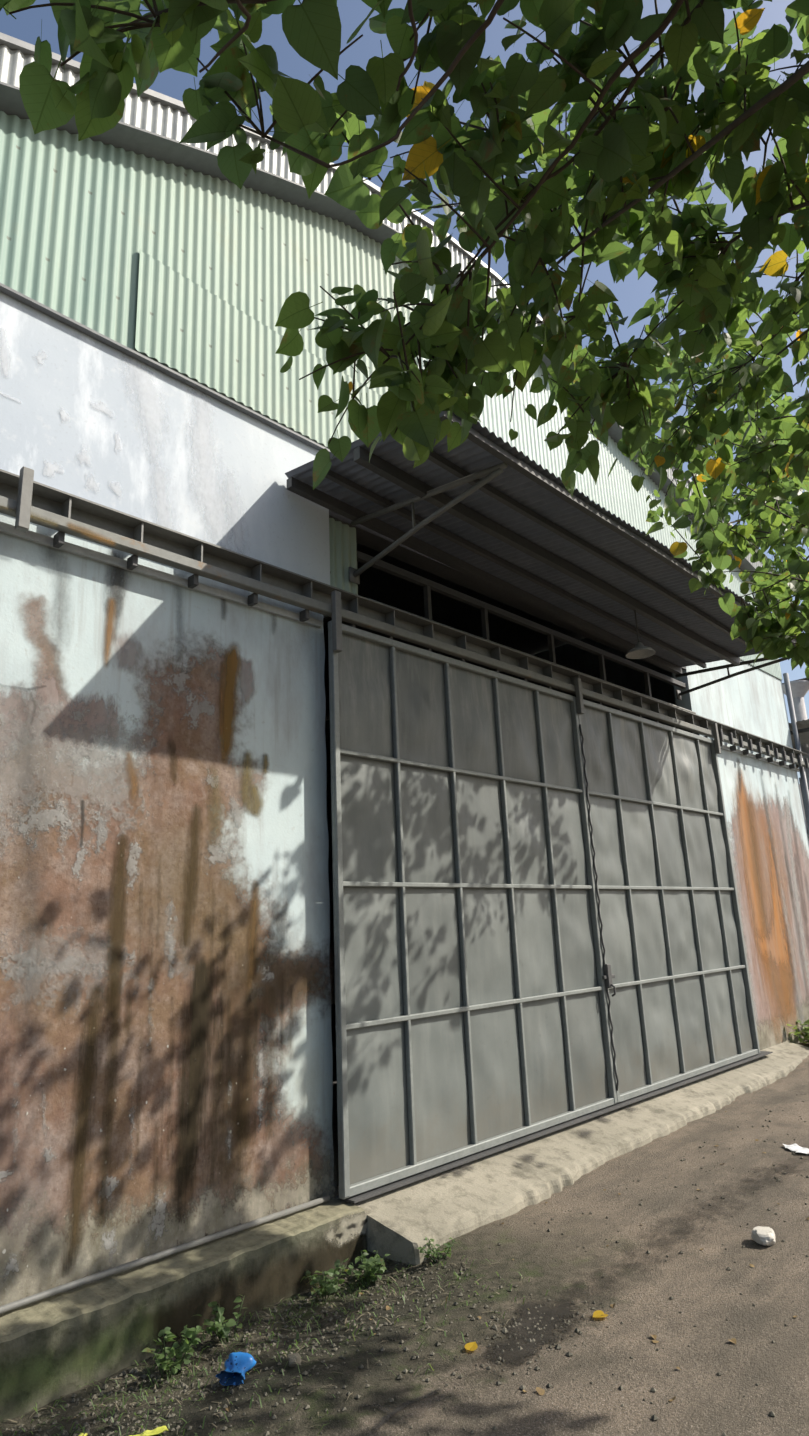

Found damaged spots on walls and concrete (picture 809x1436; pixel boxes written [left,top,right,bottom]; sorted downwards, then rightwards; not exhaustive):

rust [10,509,126,663]
rust [220,646,268,815]
water stain [184,807,200,945]
rust [248,882,259,986]
rust [737,773,793,1018]
water stain [66,837,126,1265]
water stain [176,960,212,1216]